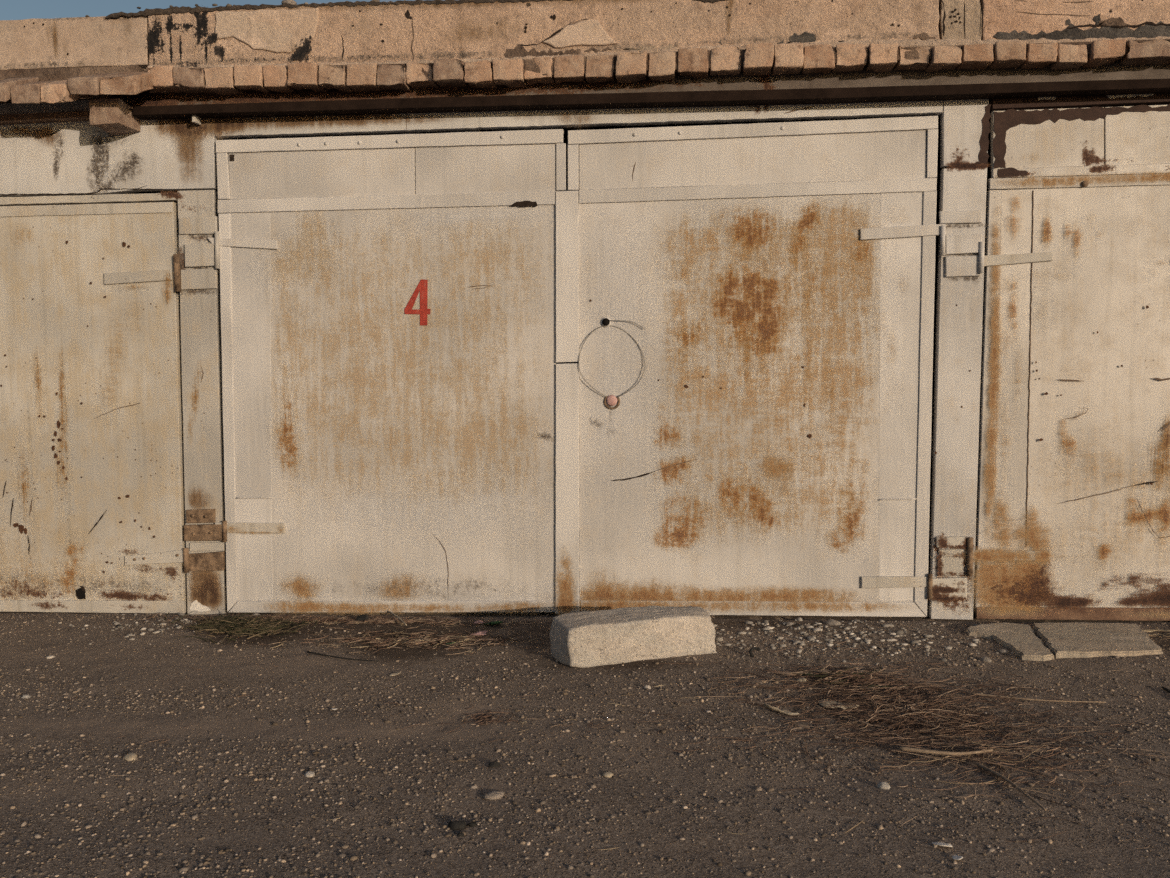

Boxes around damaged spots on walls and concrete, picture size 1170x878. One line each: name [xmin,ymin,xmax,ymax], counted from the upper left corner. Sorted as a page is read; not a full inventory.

damp [169,27,182,63]
damp [87,133,139,192]
corrosion [946,148,997,177]
peeling [976,94,1170,177]
corrosion [1016,141,1170,186]
corrosion [655,205,877,550]
corrosion [932,198,1170,618]
corrosion [1,545,83,609]
corrosion [95,583,166,610]
corrosion [141,565,222,609]
corrosion [278,577,461,614]
corrosion [557,559,882,614]